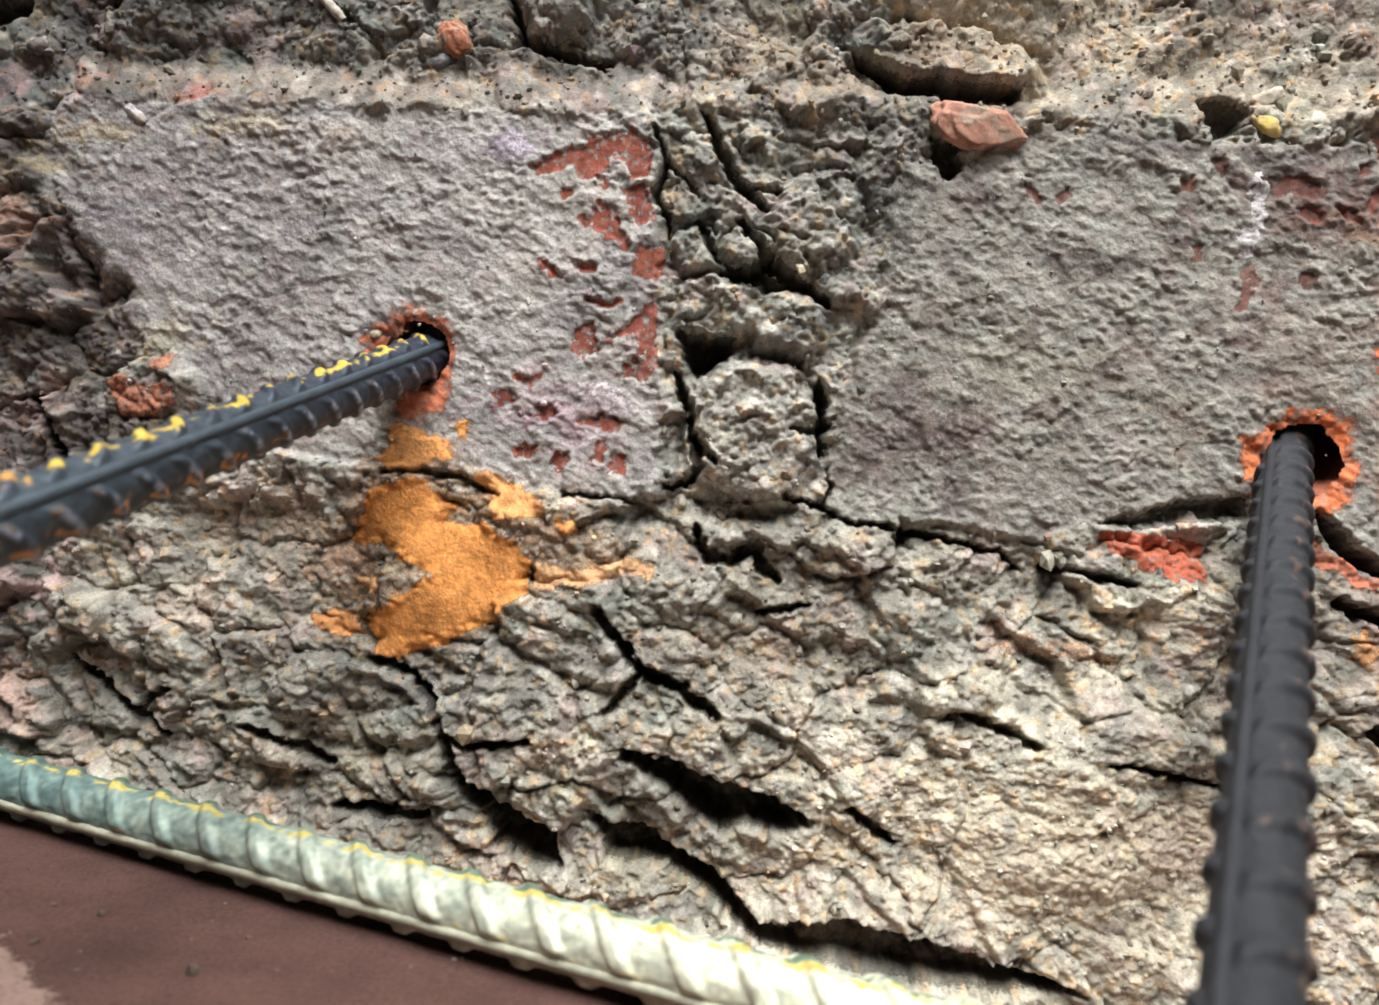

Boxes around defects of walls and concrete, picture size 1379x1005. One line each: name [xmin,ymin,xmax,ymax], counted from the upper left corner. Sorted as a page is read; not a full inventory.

spalling [0,302,458,569]
rust [358,319,406,345]
peeling [528,125,666,383]
crack [592,605,721,724]
spalling [678,331,738,378]
crack [650,111,831,310]
crack [692,524,810,616]
crack [782,380,1138,589]
crack [960,712,1042,752]
spalling [1098,406,1379,1005]
crack [1315,514,1379,630]
spalling [0,746,1076,1005]